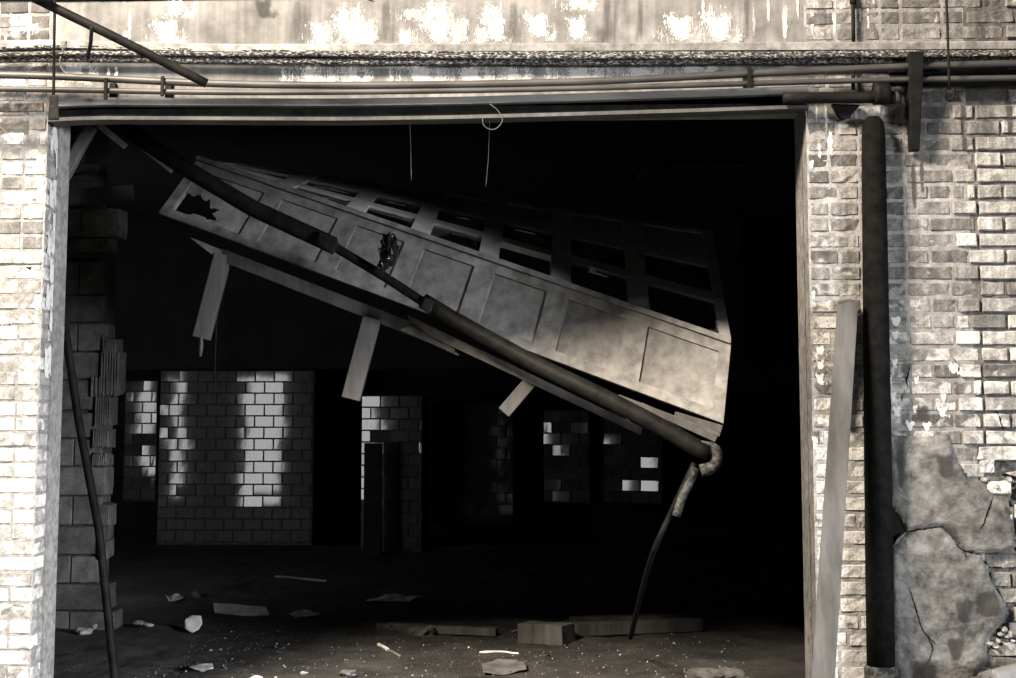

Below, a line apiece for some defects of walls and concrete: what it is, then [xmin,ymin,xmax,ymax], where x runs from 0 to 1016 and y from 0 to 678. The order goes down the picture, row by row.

peeling [302,3,380,44]
peeling [390,0,555,44]
peeling [552,0,596,41]
peeling [658,5,745,43]
peeling [281,66,374,82]
peeling [387,65,721,81]
spalling [893,510,906,545]
crack [908,526,980,558]
spalling [977,446,1016,669]
crack [909,589,935,661]